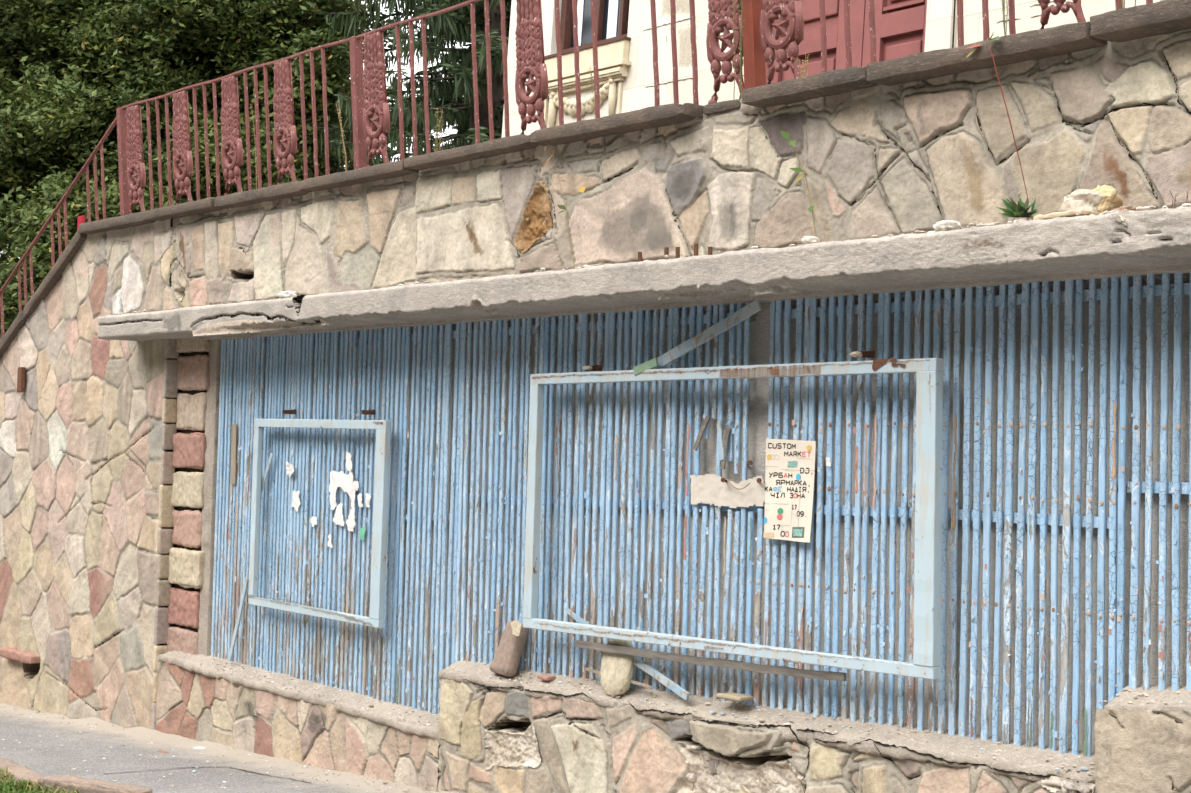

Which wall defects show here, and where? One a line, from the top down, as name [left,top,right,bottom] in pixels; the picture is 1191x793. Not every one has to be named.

peeling [192,294,329,336]
corrosion [841,358,908,371]
peeling [943,405,1093,547]
peeling [1111,402,1181,479]
peeling [215,528,440,708]
peeling [749,552,910,627]
peeling [941,587,1066,634]
peeling [1086,582,1137,636]
peeling [1143,599,1191,679]